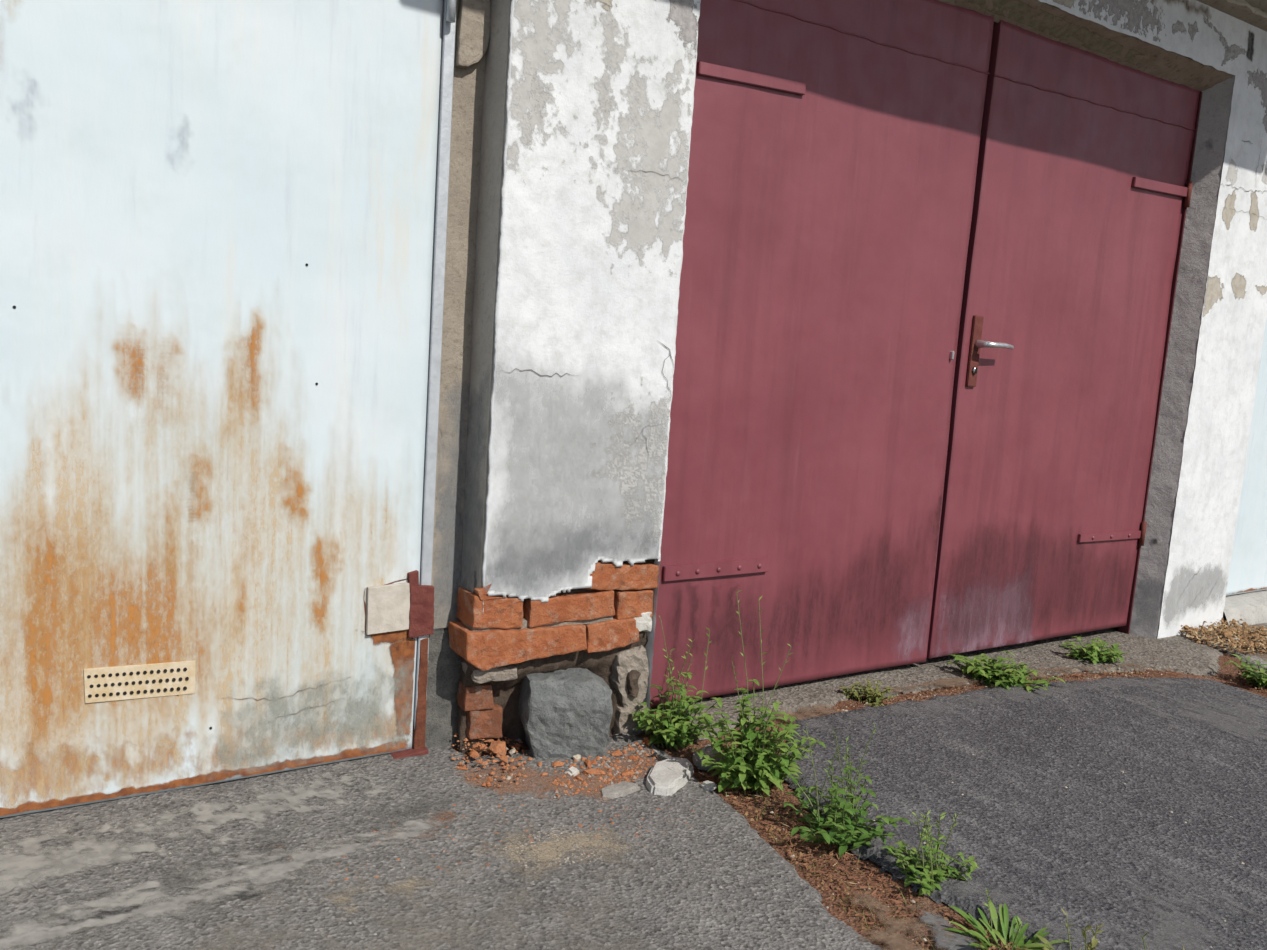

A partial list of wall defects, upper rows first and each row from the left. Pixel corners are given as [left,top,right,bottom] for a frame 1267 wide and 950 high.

peeling [1054,0,1245,66]
peeling [506,0,698,269]
peeling [1247,70,1267,133]
peeling [1222,159,1267,232]
peeling [1203,272,1267,317]
corrosion [116,342,144,397]
corrosion [228,322,262,424]
water stain [435,376,666,610]
flaking render [448,384,671,754]
water stain [1138,567,1224,623]
corrosion [0,449,428,816]